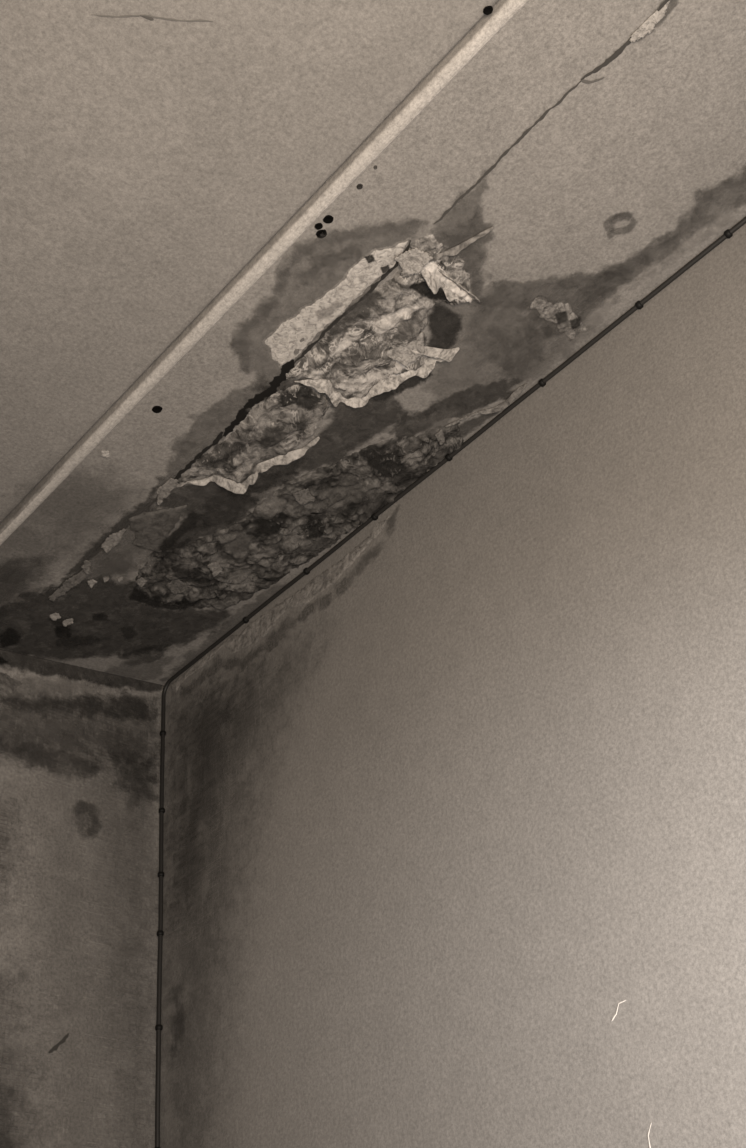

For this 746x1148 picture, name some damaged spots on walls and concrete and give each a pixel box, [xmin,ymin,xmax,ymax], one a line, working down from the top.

crack [433,37,631,225]
peeling [0,226,527,693]
crack [124,240,411,529]
leakage [145,172,746,550]
leakage [0,696,153,798]
leakage [0,562,284,681]